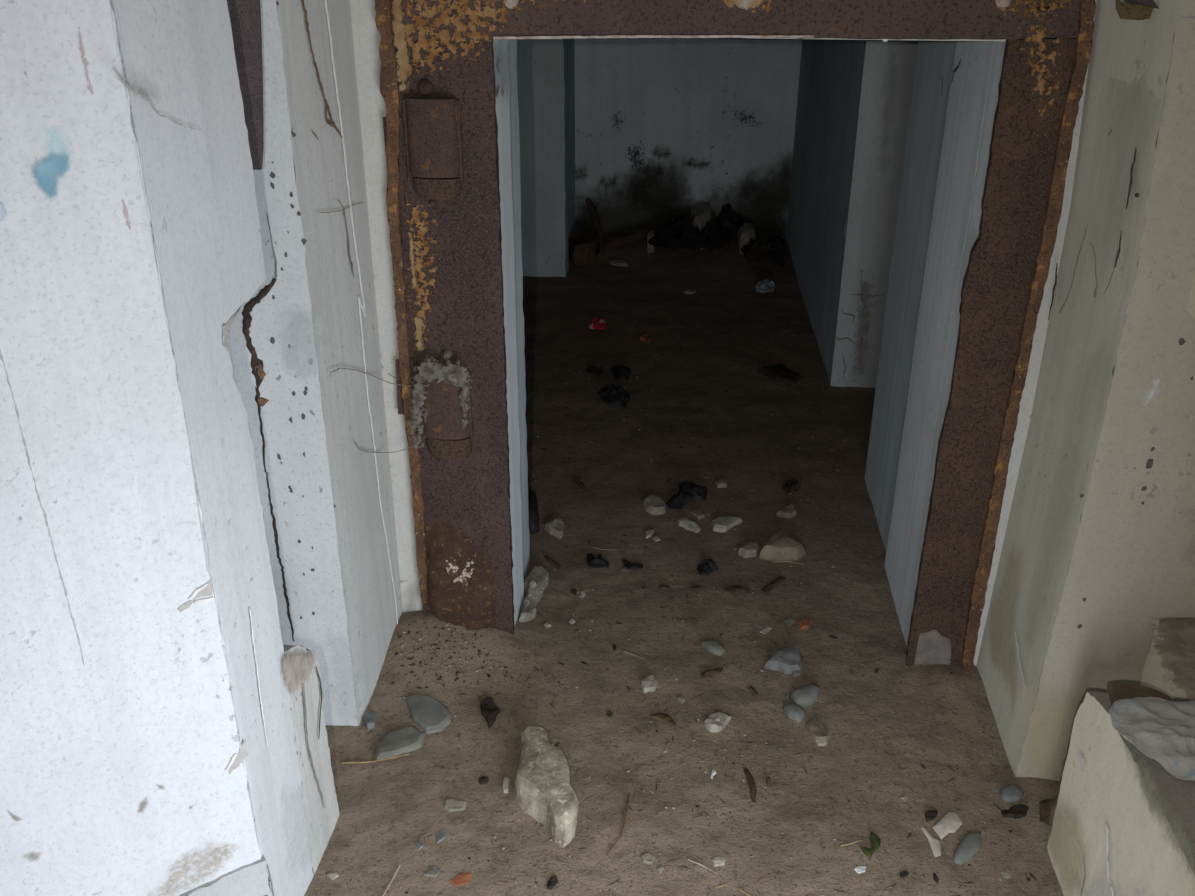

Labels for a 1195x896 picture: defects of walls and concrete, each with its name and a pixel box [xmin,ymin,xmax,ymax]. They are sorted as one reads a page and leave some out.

rust [391,0,539,92]
rust [723,0,772,13]
rust [998,0,1081,136]
water stain [575,141,709,233]
water stain [707,163,791,240]
rust [405,201,438,351]
crack [242,213,294,642]
rust [446,559,474,586]
spalling [283,652,315,693]
rust [914,630,951,665]